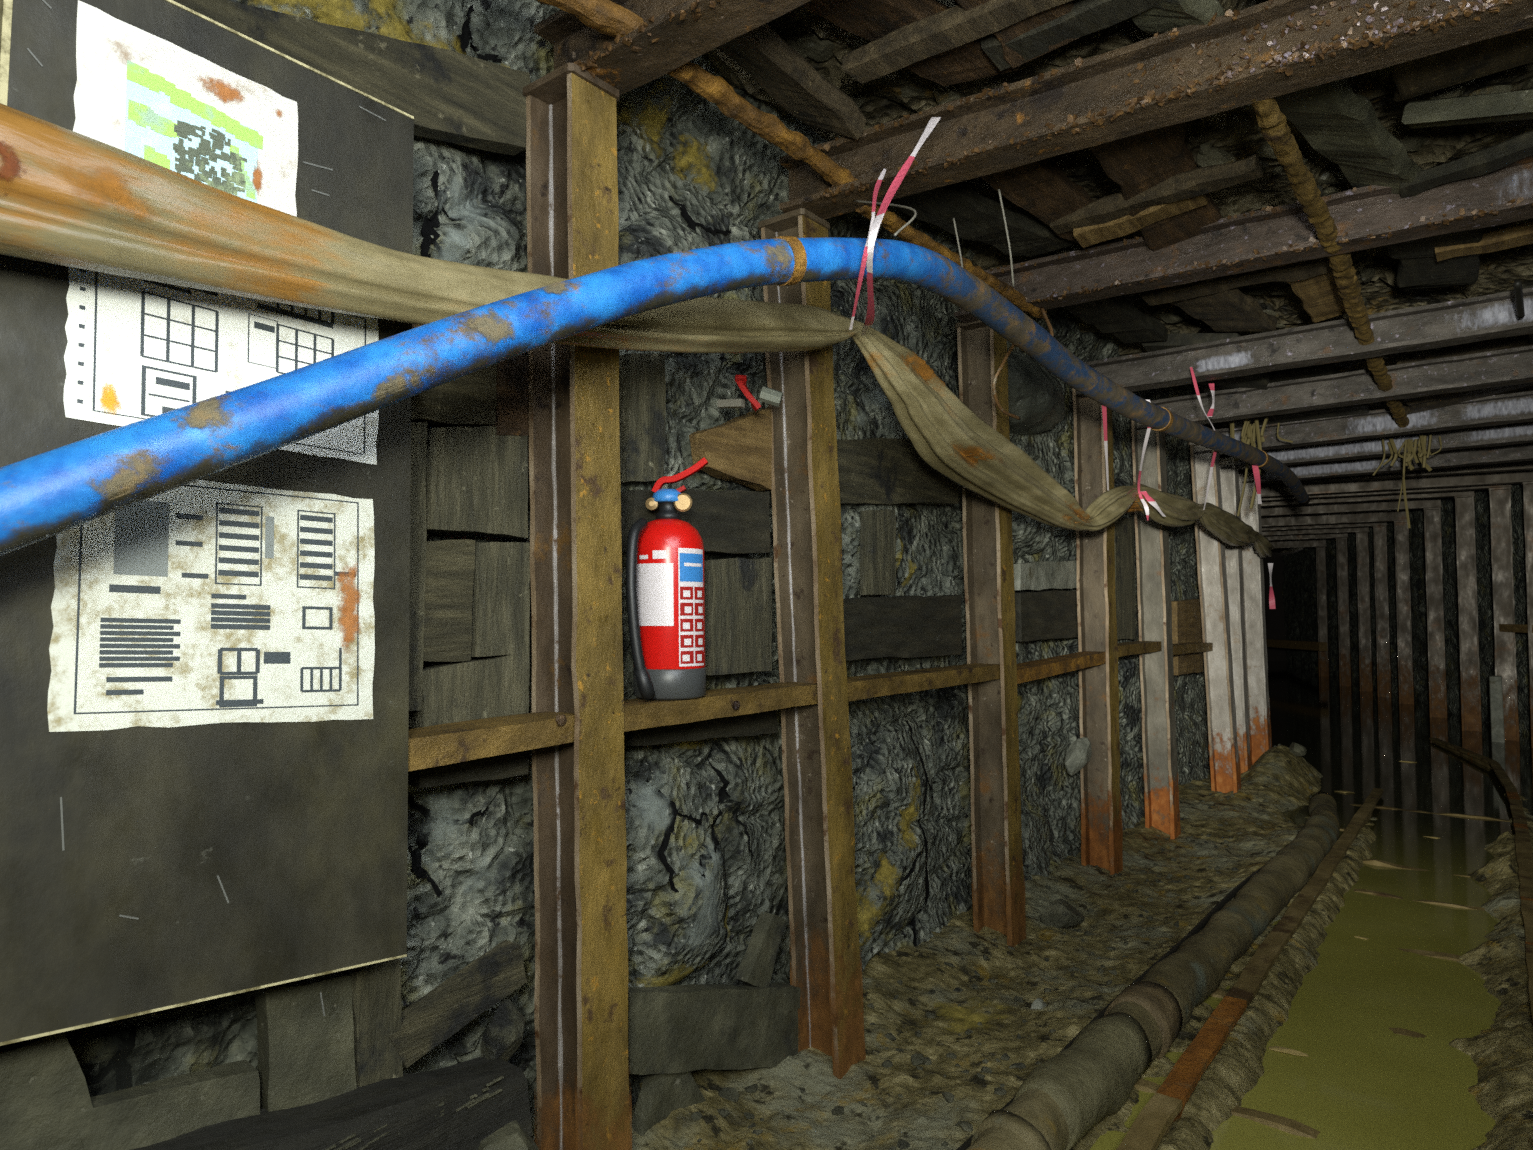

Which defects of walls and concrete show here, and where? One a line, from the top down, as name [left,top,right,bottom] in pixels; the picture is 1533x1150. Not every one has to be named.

rust [0,142,20,195]
rust [86,172,147,217]
rust [253,163,262,191]
rust [1208,708,1272,793]
rust [1144,775,1181,839]